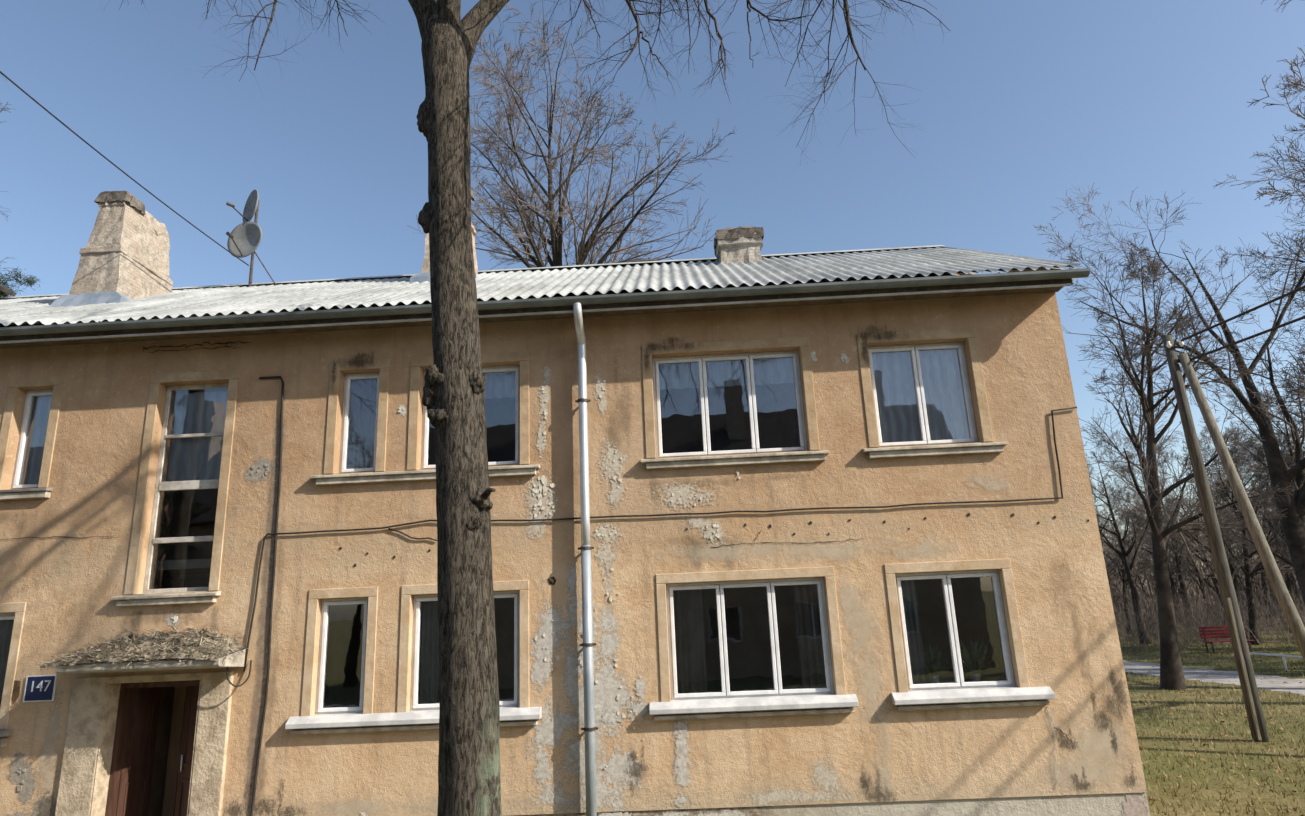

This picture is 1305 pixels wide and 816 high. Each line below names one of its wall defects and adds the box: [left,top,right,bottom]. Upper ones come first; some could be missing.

peeling [593,370,608,416]
peeling [522,364,562,544]
crack [0,534,119,542]
peeling [649,480,729,545]
peeling [524,439,649,813]
leakage [1092,669,1128,753]
spalling [6,753,57,816]
leakage [860,768,895,802]